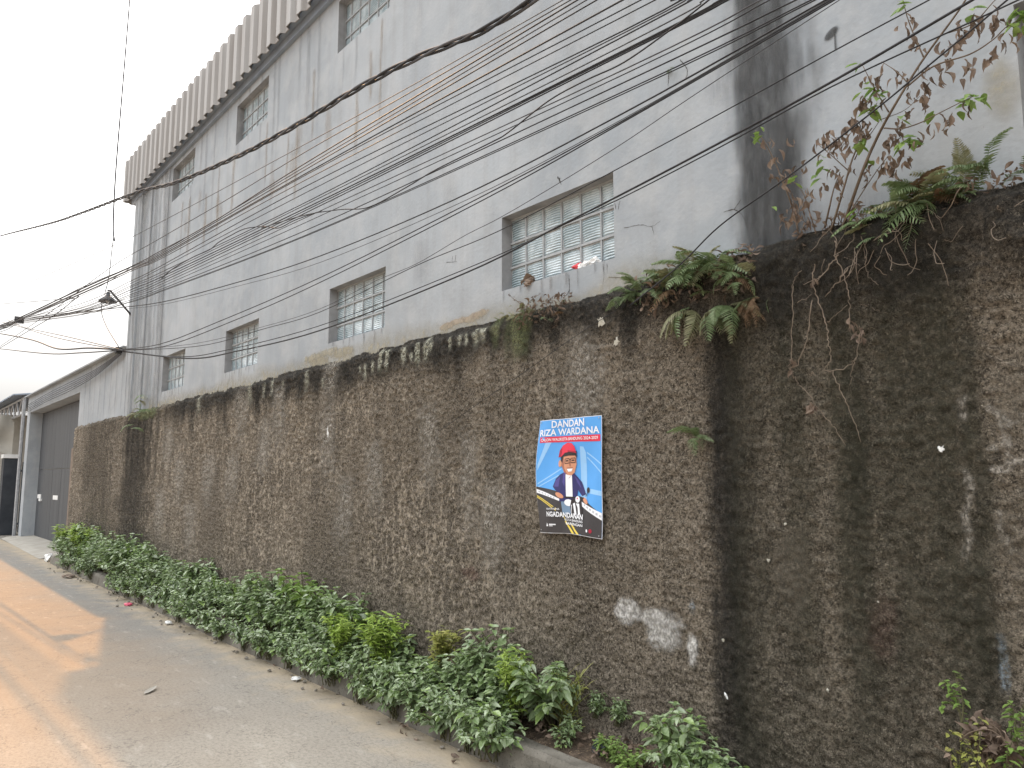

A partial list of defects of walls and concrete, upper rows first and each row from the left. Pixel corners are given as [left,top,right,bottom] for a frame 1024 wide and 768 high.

damp [737,0,798,253]
damp [118,274,705,560]
damp [711,322,745,725]